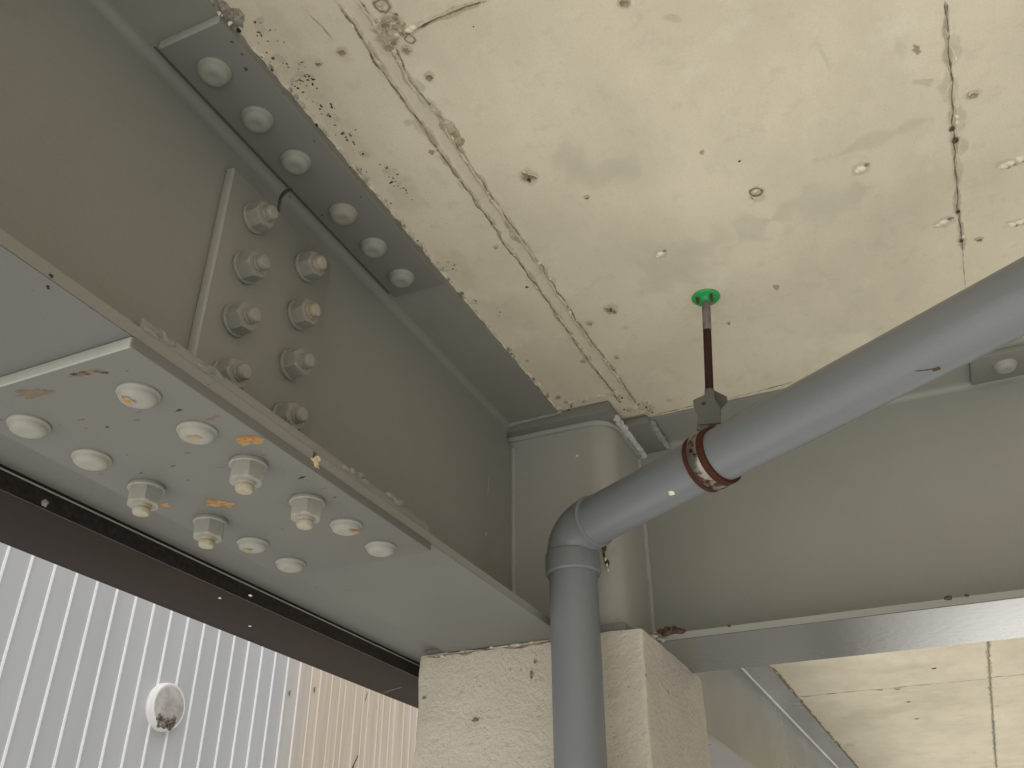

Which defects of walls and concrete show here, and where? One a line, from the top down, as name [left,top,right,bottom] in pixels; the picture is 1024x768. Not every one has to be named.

spalling [369,0,417,65]
crack [411,0,489,34]
crack [935,0,970,288]
spalling [217,11,568,408]
corrosion [234,436,265,447]